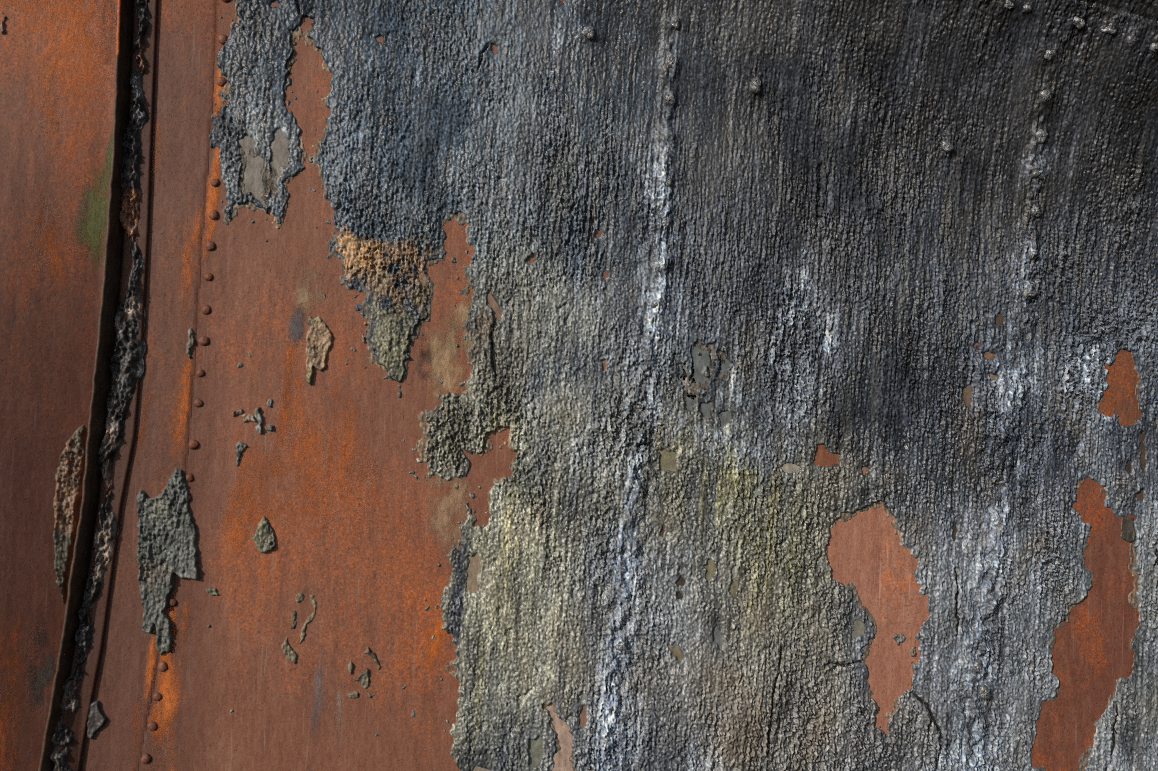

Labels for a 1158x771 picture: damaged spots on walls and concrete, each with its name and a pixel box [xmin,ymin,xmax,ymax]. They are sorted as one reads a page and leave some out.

corrosion [194,147,219,237]
corrosion [336,228,429,380]
corrosion [50,0,151,771]
corrosion [175,362,190,438]
peeling [136,0,517,771]
peeling [1096,350,1146,474]
corrosion [147,631,176,724]
peeling [826,505,930,734]
peeling [1030,477,1140,771]